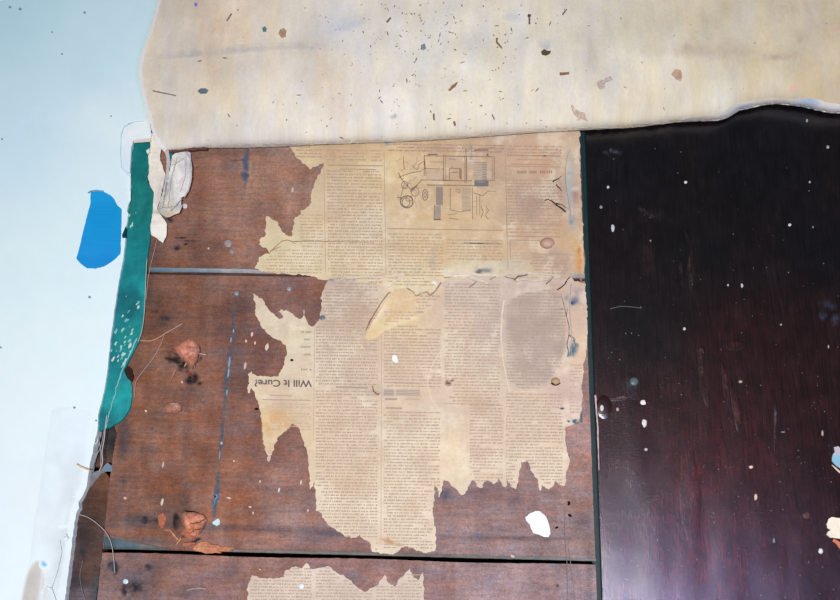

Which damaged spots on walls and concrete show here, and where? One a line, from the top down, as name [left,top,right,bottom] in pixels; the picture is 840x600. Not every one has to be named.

crack [544,177,566,212]
crack [366,277,450,330]
peeling [525,511,550,537]